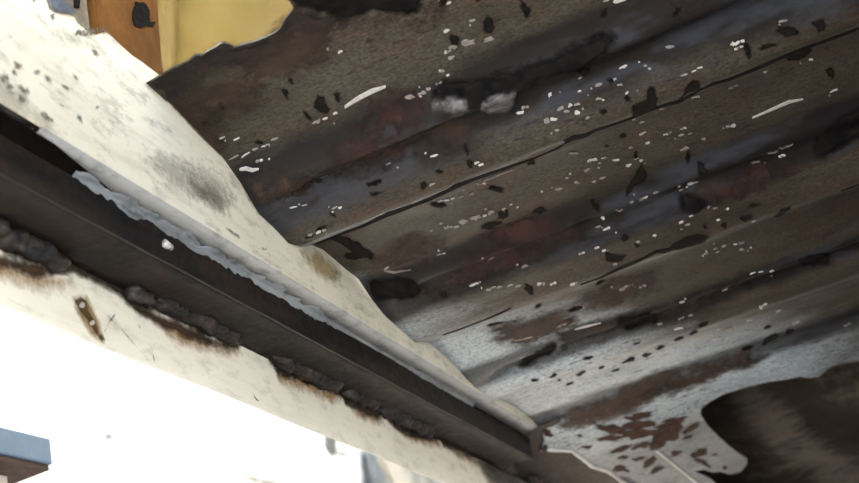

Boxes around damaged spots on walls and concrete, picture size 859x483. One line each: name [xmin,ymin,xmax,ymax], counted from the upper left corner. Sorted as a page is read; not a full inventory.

spalling [444,15,495,60]
spalling [303,85,386,125]
peeling [405,69,449,100]
spalling [544,65,665,145]
peeling [752,98,803,119]
spalling [0,103,113,192]
peeling [229,137,278,172]
spalling [568,134,659,212]
rust [75,298,104,340]
rust [492,272,749,368]
spalling [599,345,664,372]
spalling [577,411,716,474]